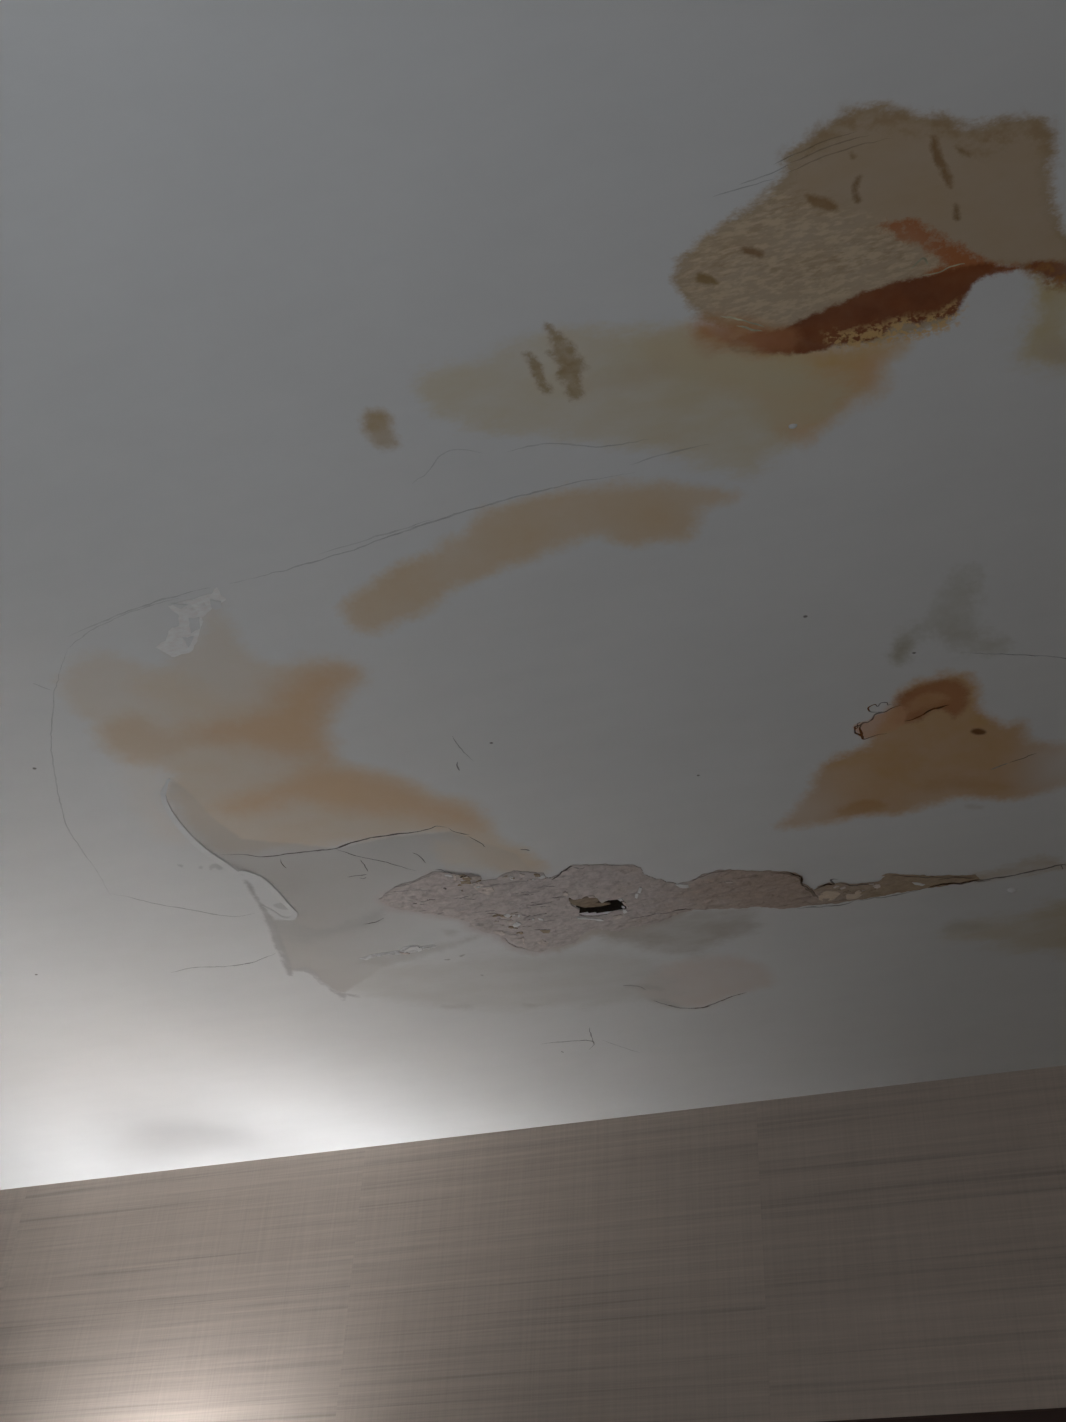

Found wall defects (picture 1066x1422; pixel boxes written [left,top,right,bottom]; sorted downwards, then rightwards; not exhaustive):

water stain [37,86,1066,880]
crack [222,826,485,879]
spalling [158,775,990,978]